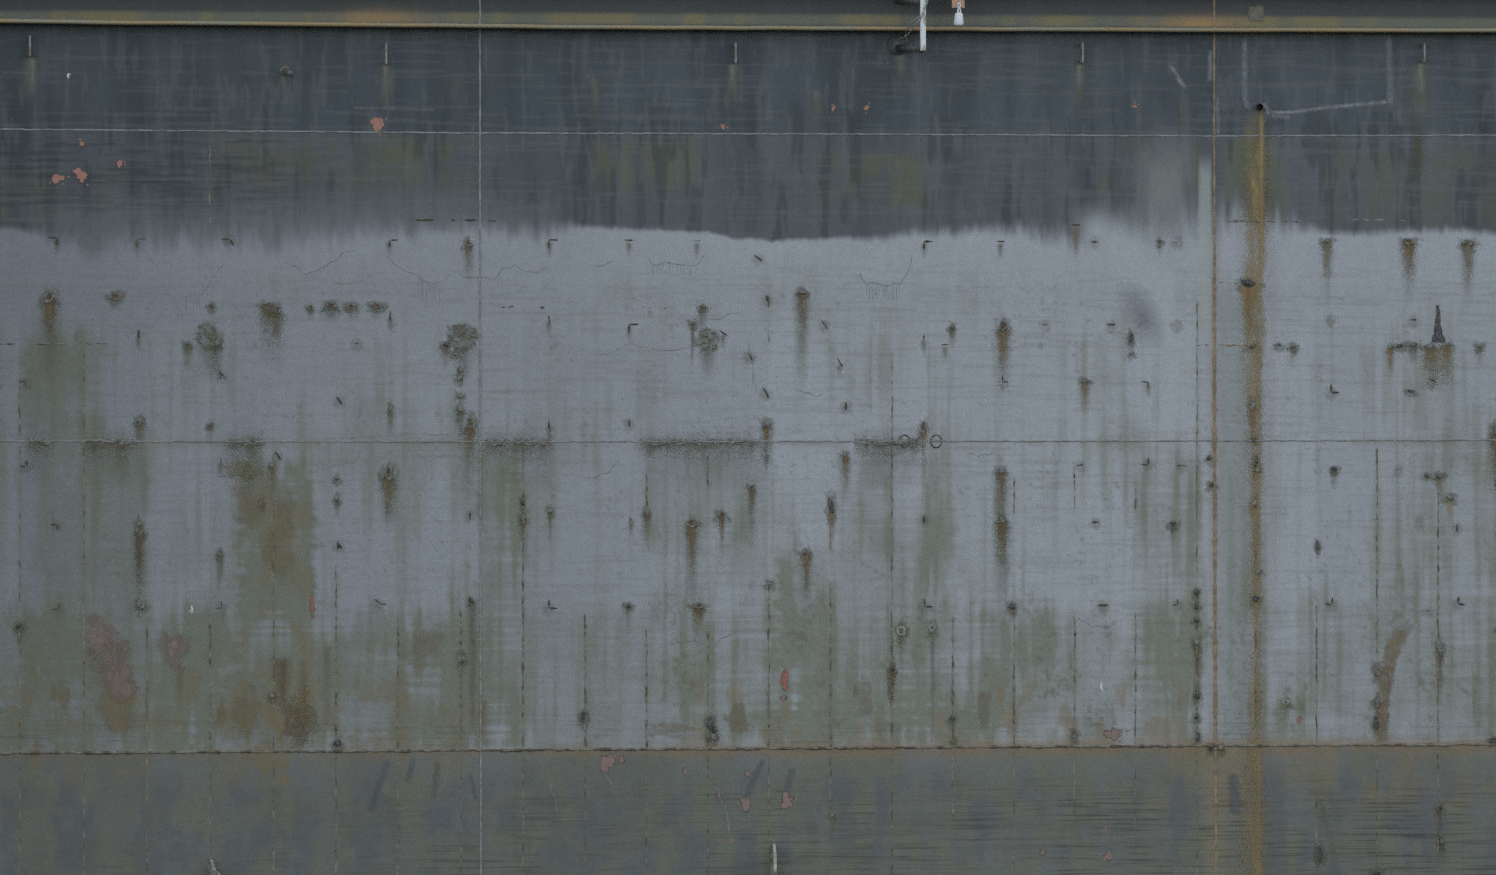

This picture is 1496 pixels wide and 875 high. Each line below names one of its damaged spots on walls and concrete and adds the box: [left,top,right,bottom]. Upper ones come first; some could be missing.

peeling [49,168,89,185]
rust [1241,117,1263,313]
rust [1431,305,1446,360]
rust [1373,631,1405,737]